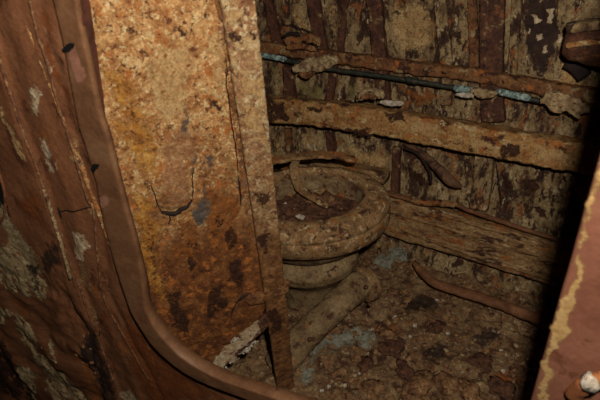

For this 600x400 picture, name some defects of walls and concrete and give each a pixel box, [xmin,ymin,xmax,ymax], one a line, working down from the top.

corrosion [282,32,339,79]
peeling [524,0,565,77]
peeling [27,87,42,116]
corrosion [266,96,289,123]
corrosion [500,143,520,158]
crack [56,207,91,218]
corrosion [103,62,190,332]
crack [150,170,194,225]
corrosion [254,191,270,205]
peeling [0,204,48,302]
corrosion [207,259,244,319]
peeling [537,169,600,400]